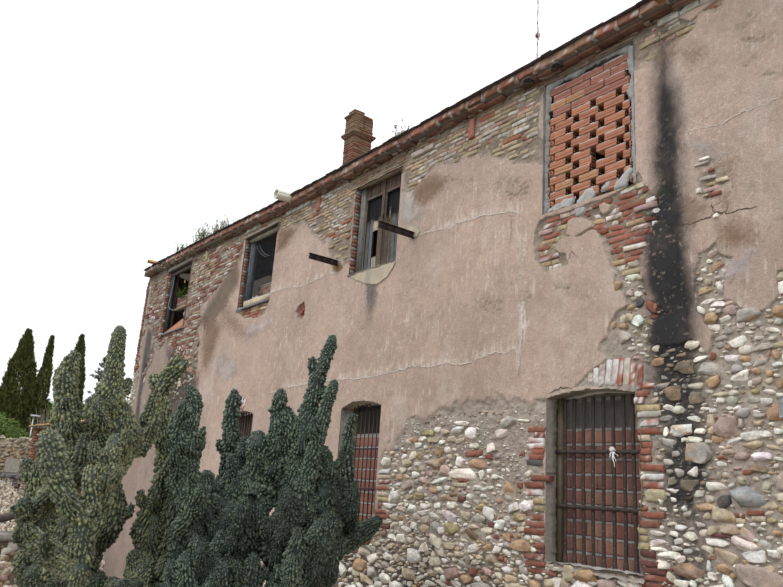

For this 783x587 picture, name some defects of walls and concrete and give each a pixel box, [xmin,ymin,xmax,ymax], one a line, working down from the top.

peeling [130,0,723,406]
peeling [694,156,729,201]
crack [687,201,757,230]
crack [326,333,523,406]
peeling [332,173,783,587]